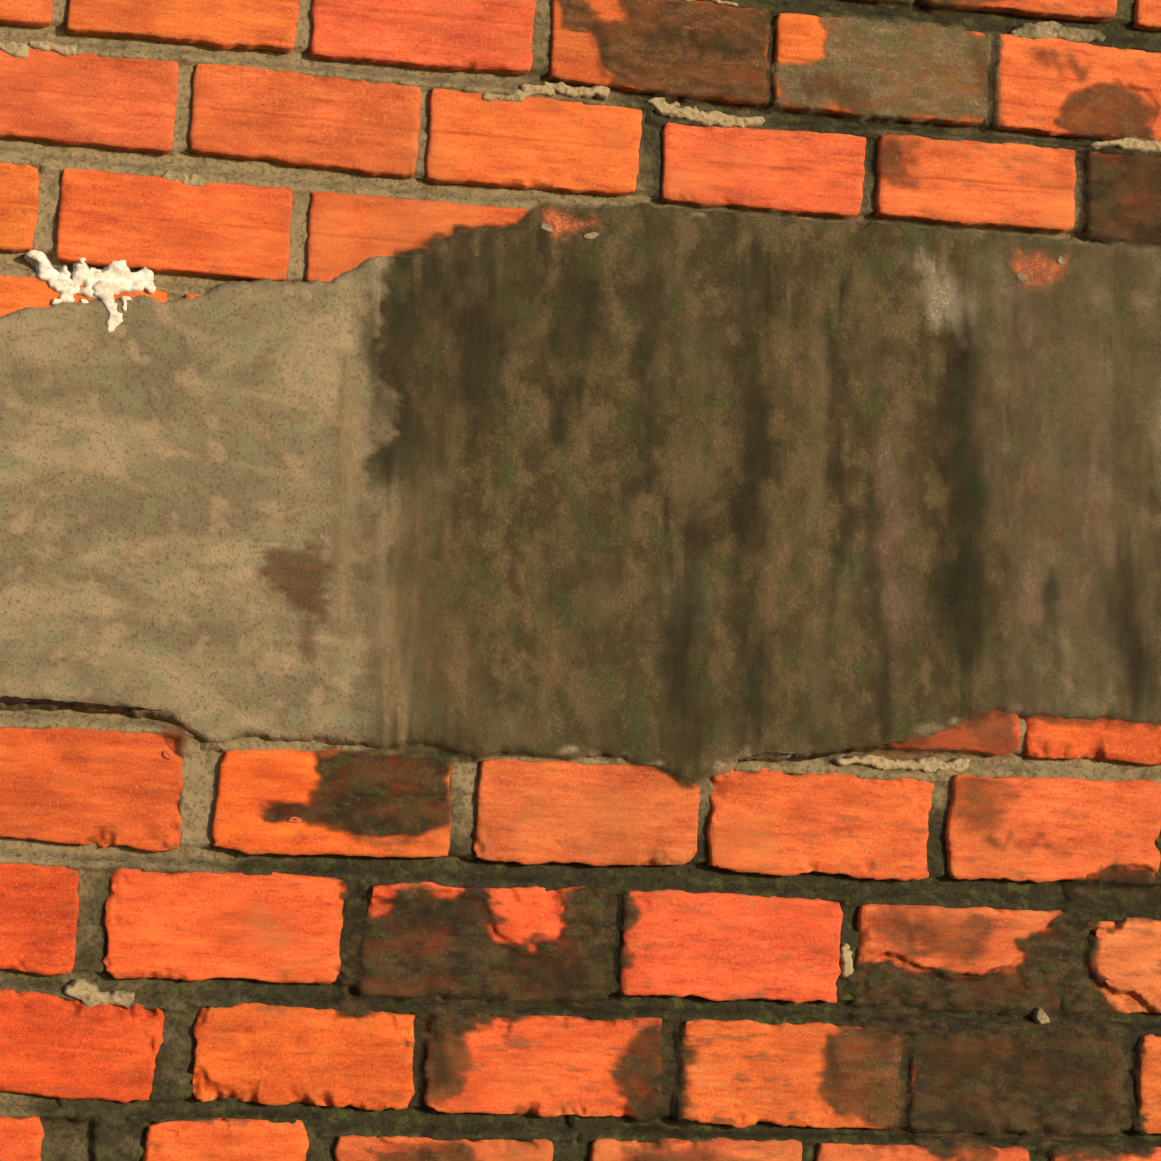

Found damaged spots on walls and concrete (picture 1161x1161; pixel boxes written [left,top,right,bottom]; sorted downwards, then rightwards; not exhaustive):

leakage [558,0,771,105]
leakage [262,83,1161,787]
leakage [820,1024,909,1130]